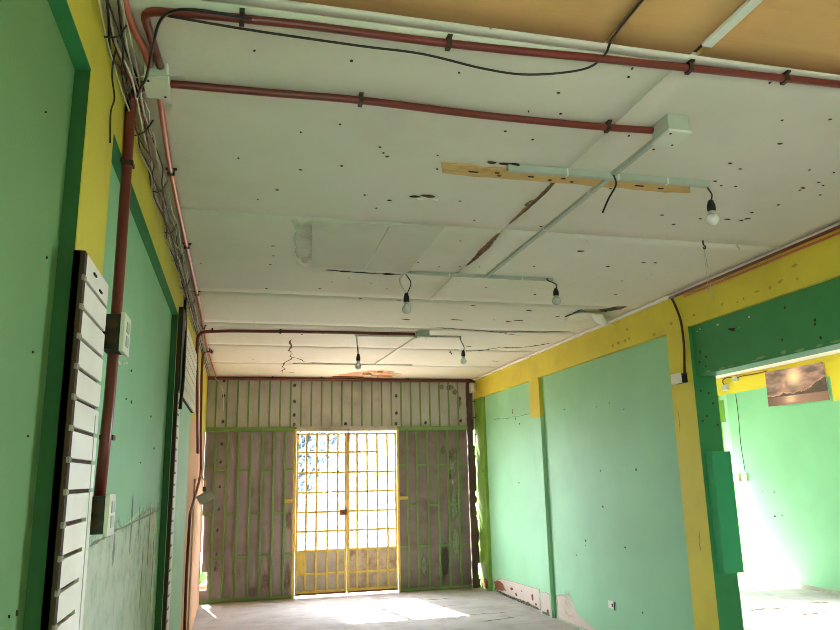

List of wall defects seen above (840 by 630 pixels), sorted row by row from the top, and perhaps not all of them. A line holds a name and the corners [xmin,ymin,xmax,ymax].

crack [281,339,331,372]
flaking render [482,578,596,630]